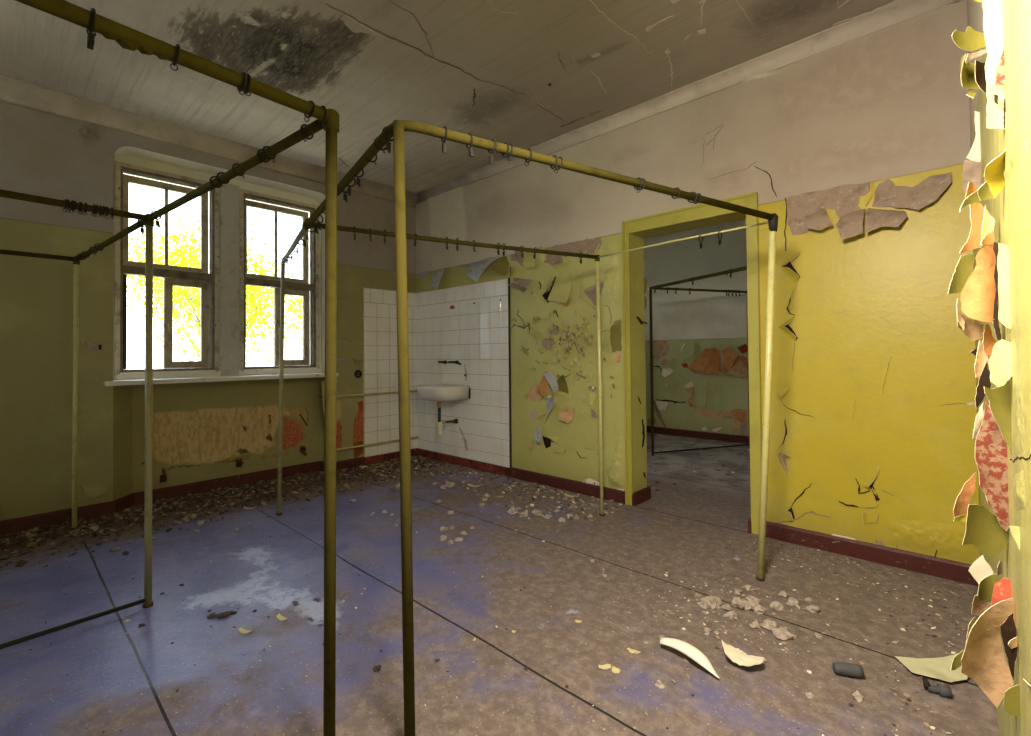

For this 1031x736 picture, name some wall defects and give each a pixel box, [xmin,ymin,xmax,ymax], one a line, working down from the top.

leakage [152,0,382,99]
crack [326,1,607,121]
crack [589,0,706,87]
flaking render [152,404,293,467]
peeling [393,236,622,458]
peeling [648,340,748,435]
crack [777,405,815,451]
flaking render [779,0,1020,716]
crack [776,478,894,524]